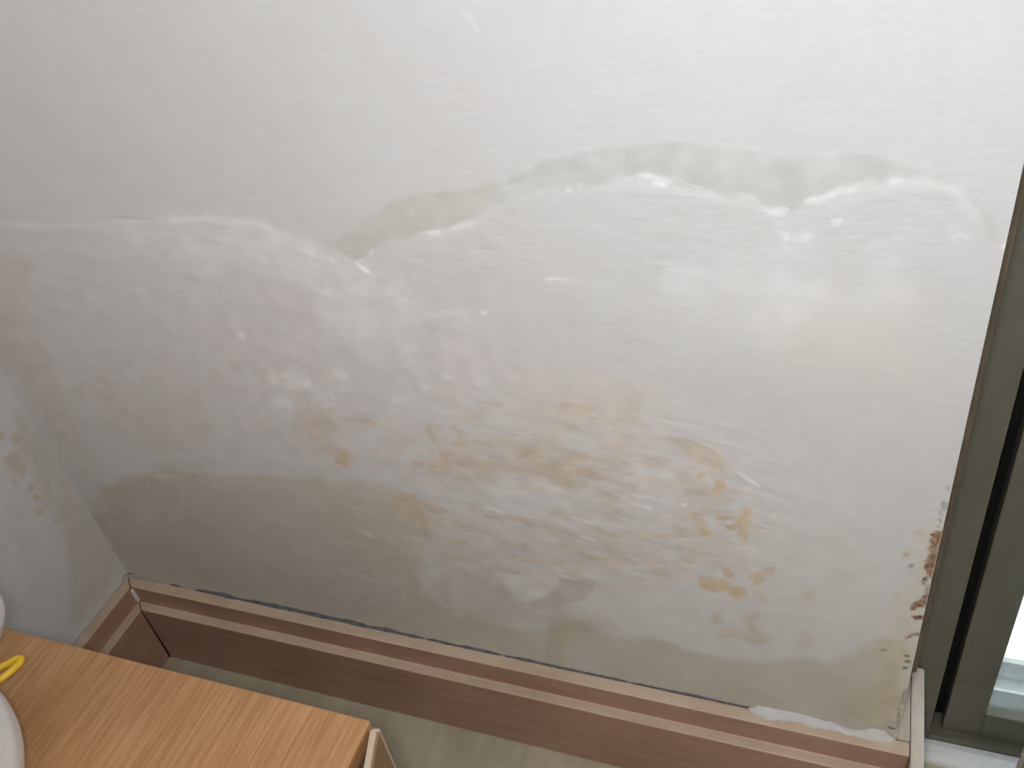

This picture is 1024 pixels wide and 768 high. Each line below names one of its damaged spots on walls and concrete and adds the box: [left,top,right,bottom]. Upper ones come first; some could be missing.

leakage [196,589,749,709]